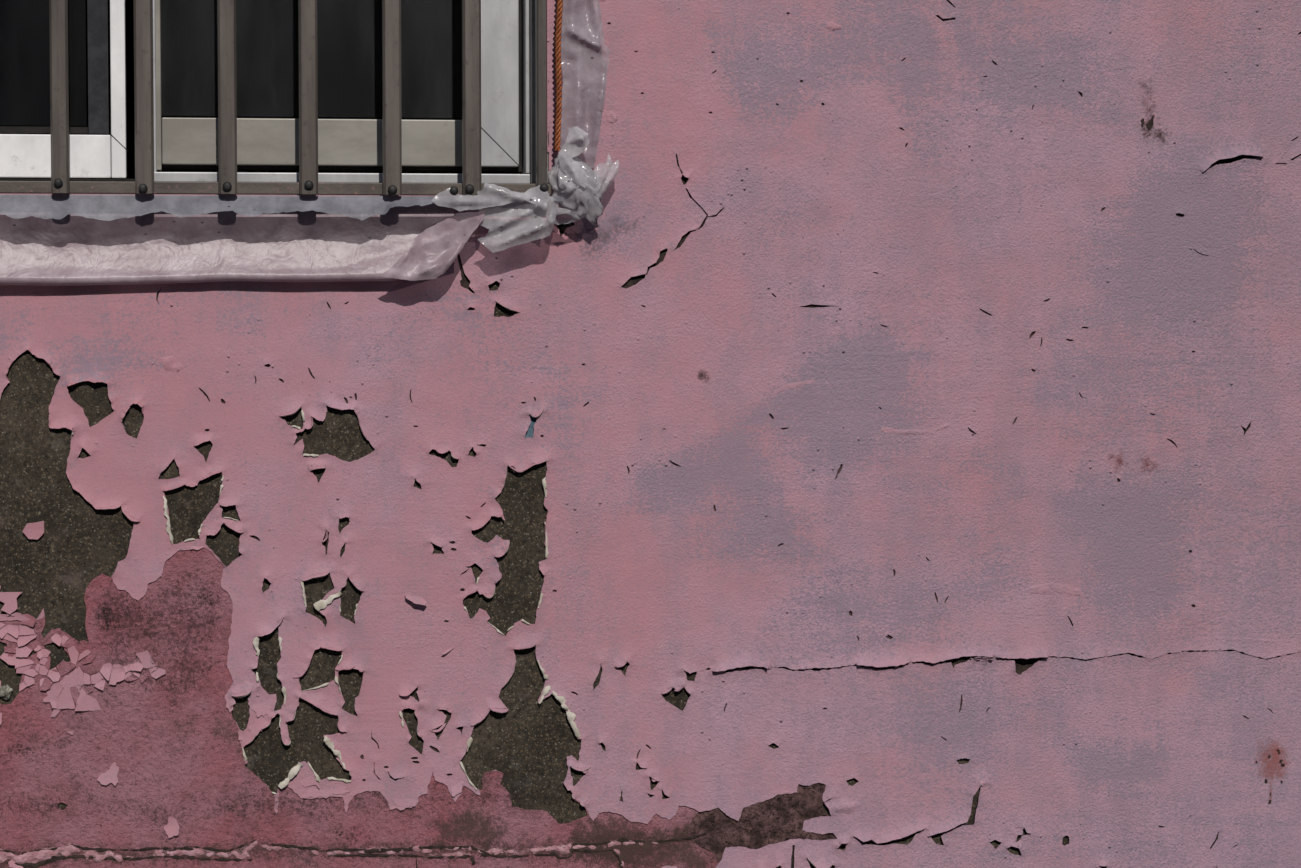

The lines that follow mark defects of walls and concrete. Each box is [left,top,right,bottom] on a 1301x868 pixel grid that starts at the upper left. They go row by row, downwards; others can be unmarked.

crack [621,154,724,288]
peeling [0,350,724,868]
crack [706,649,1294,675]
crack [0,832,707,868]